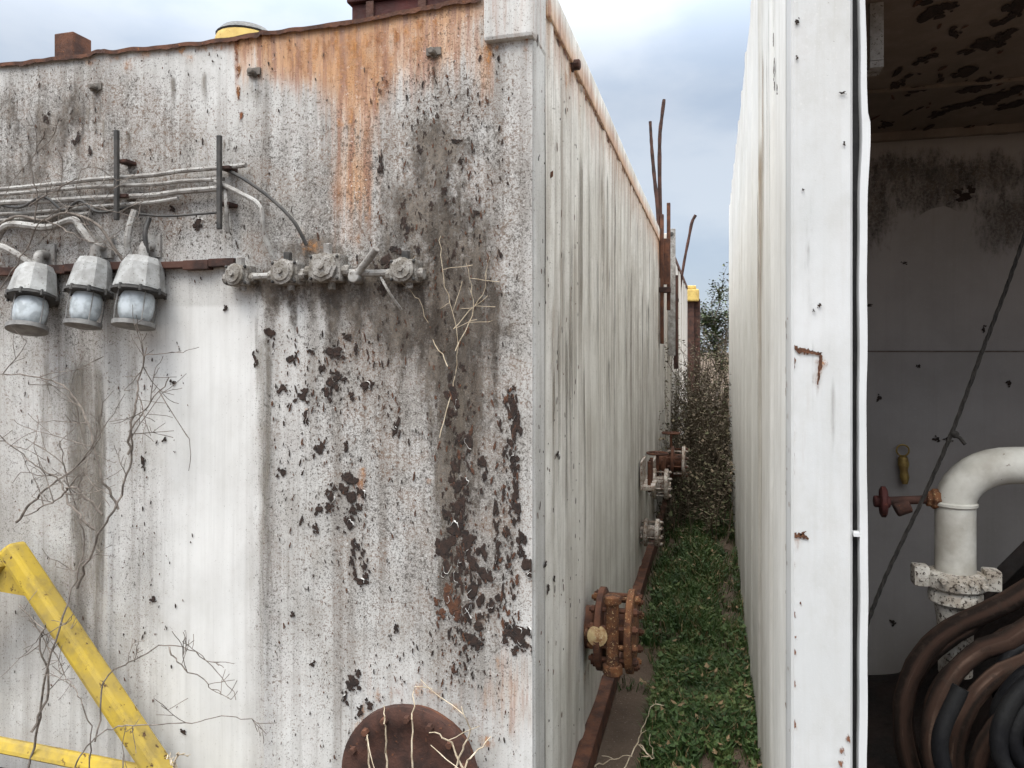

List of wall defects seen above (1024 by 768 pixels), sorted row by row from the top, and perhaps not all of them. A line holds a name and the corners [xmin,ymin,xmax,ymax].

corrosion [220,37,259,99]
peeling [870,0,1024,131]
peeling [0,99,107,224]
peeling [162,198,216,239]
peeling [252,60,580,755]
leakage [400,228,499,494]